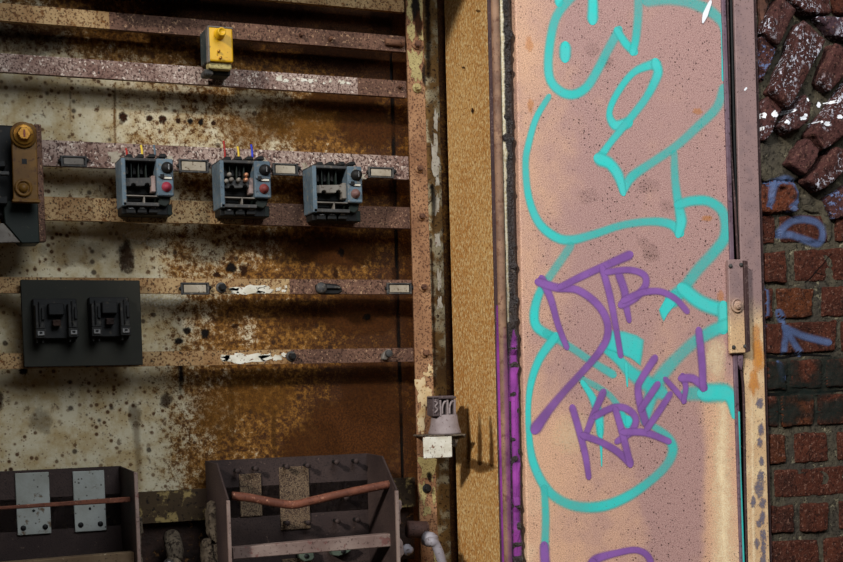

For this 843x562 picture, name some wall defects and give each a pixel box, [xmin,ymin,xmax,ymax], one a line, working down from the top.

peeling [406,0,423,82]
corrosion [113,89,127,143]
corrosion [176,93,397,156]
peeling [229,285,287,295]
peeling [220,352,286,364]
corrosion [750,340,763,392]
peeling [414,363,433,434]